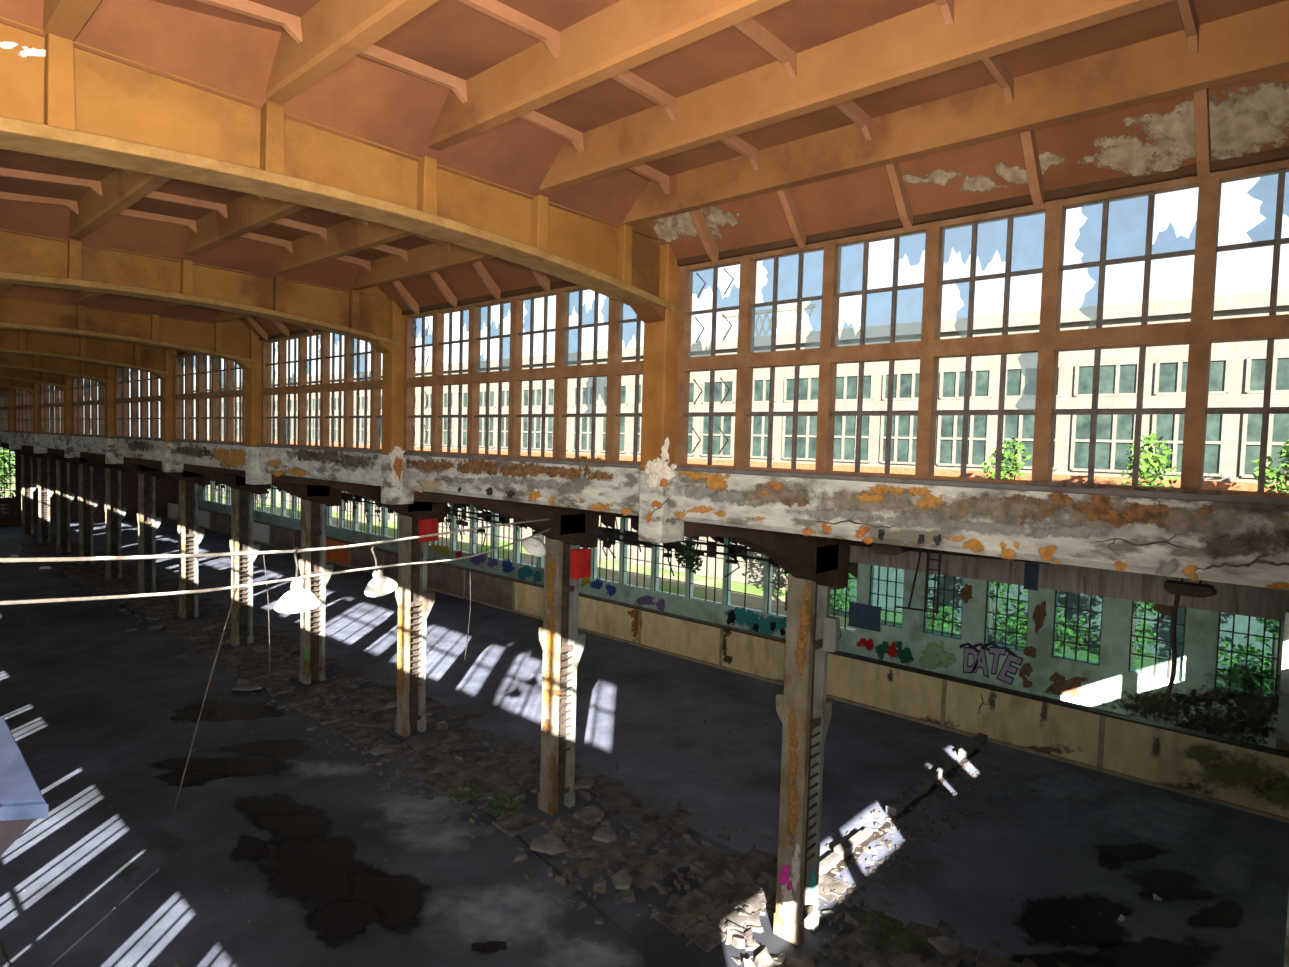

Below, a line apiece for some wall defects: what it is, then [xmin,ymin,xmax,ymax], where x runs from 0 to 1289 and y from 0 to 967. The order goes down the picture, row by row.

peeling [0,41,45,57]
peeling [902,81,1289,193]
spalling [286,446,616,499]
peeling [645,437,679,488]
spalling [855,484,1215,534]
spalling [918,534,942,546]
crack [1090,534,1289,571]